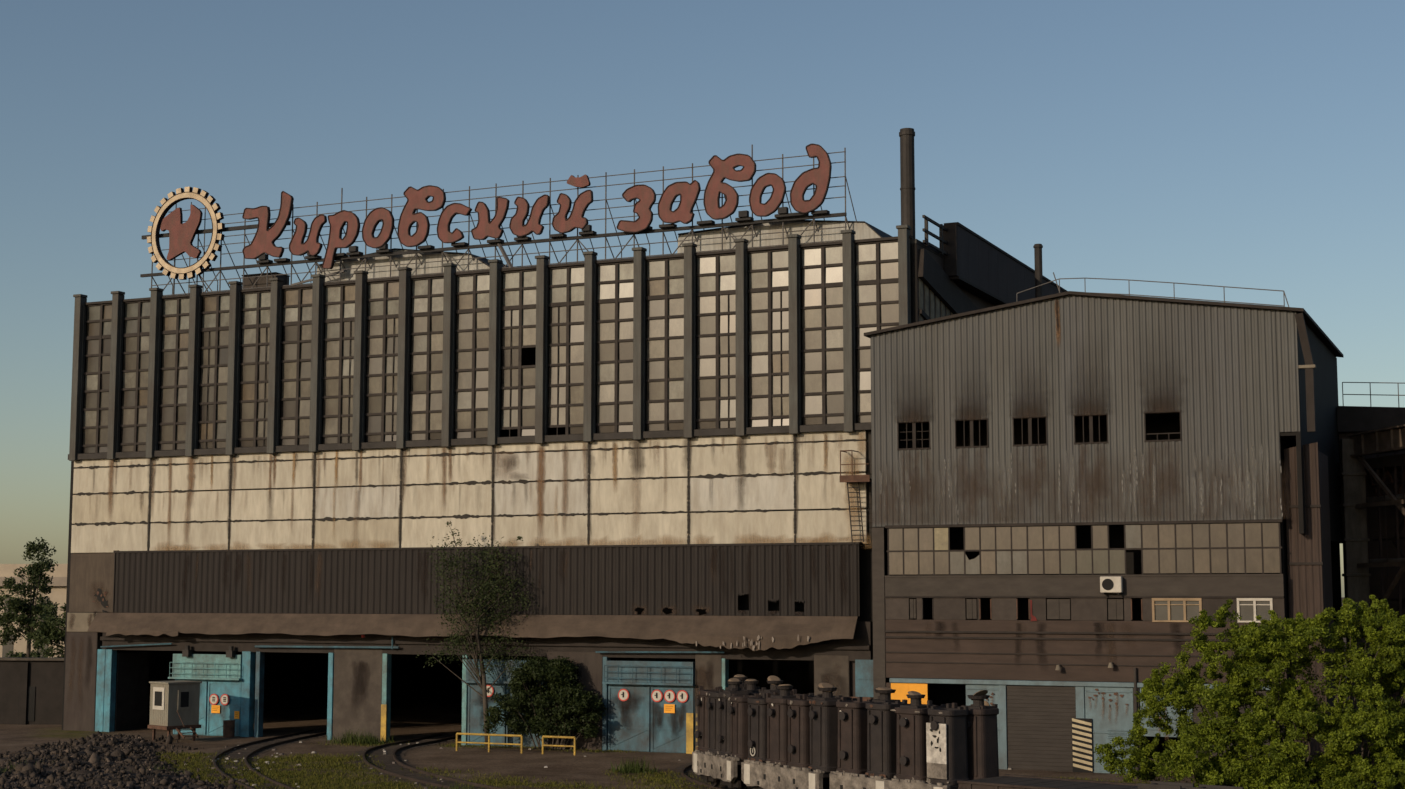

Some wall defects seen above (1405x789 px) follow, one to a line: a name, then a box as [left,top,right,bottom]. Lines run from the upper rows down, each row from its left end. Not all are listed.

corrosion [168,455,213,527]
corrosion [537,447,547,546]